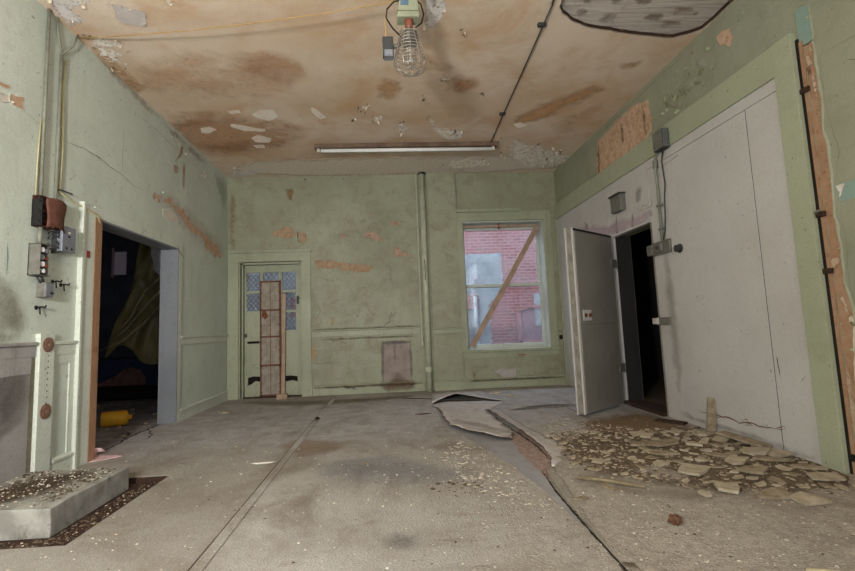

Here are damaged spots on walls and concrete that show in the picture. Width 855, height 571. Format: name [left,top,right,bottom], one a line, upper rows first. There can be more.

peeling [48,0,131,72]
peeling [422,0,447,30]
damp [519,90,595,122]
damp [176,115,289,153]
damp [237,156,566,176]
peeling [442,122,572,171]
peeling [596,99,652,175]
peeling [152,192,222,259]
flaking render [803,41,855,442]